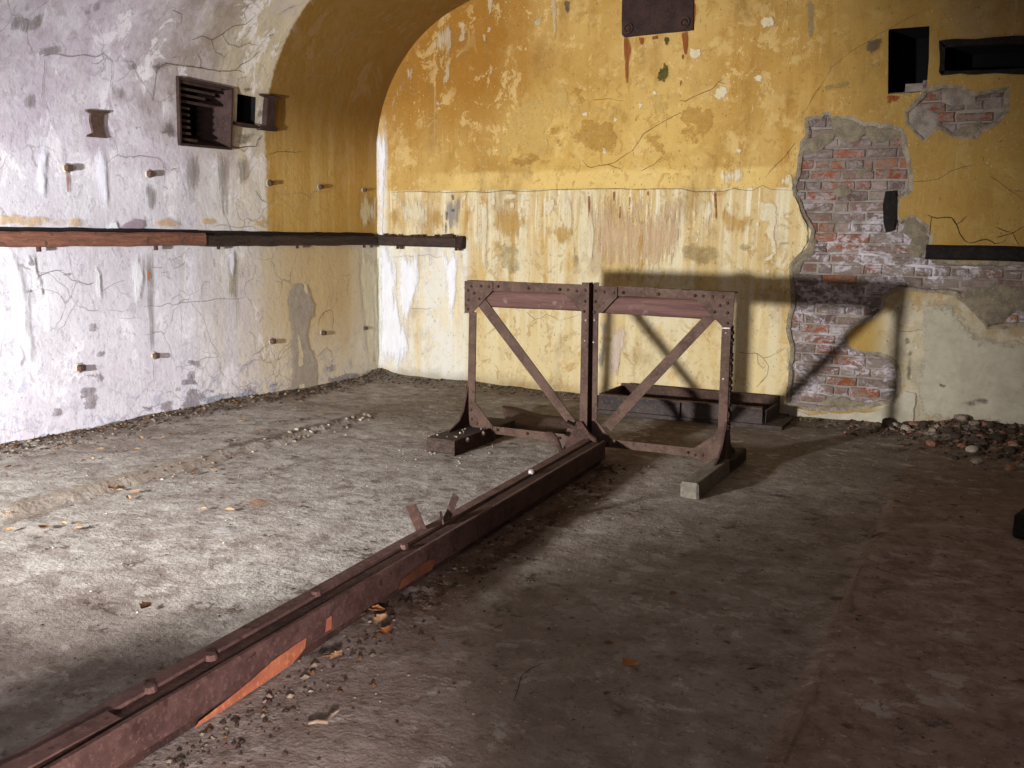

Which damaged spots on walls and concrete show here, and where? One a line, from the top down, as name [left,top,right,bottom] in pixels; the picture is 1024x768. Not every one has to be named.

crack [42,53,112,93]
crack [153,3,277,95]
rust [624,36,658,83]
rust [682,3,696,59]
crack [405,79,725,193]
leakage [588,203,680,270]
crack [684,143,808,259]
flaking render [781,80,1024,424]
crack [928,215,1022,244]
crack [29,262,254,330]